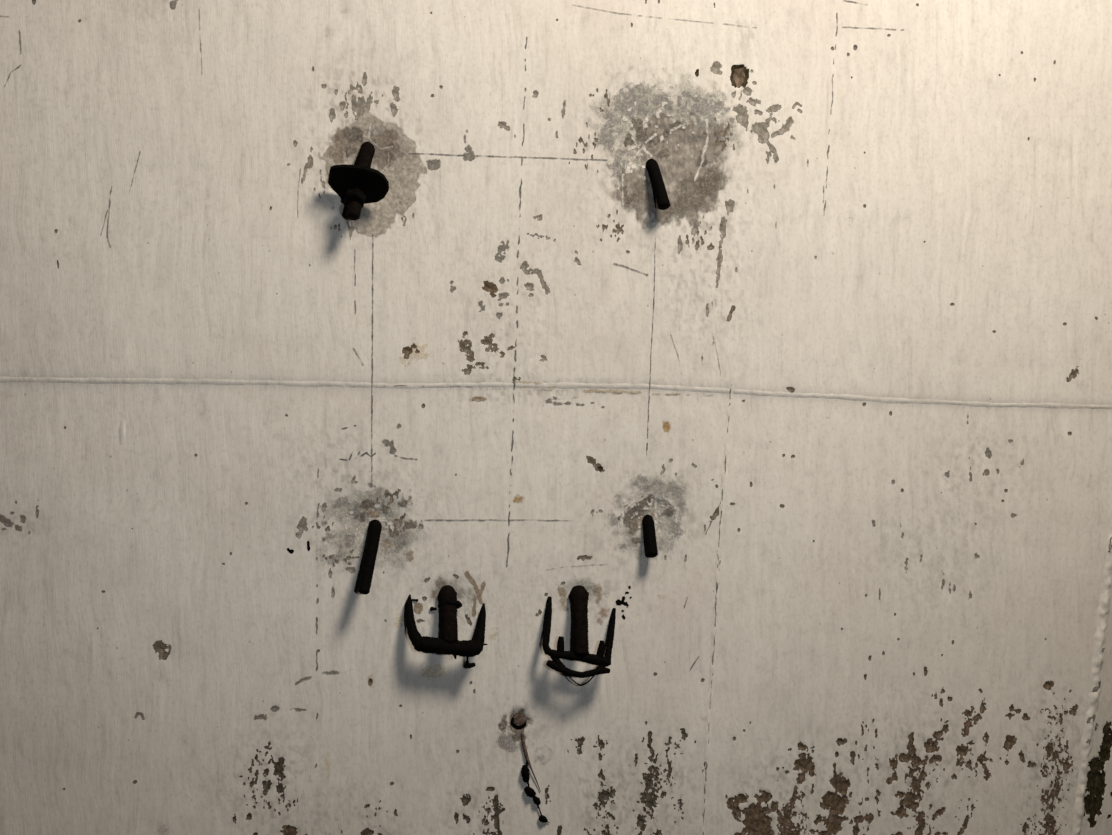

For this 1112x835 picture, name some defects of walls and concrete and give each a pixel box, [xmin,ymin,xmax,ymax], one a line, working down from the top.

spalling [498,709,533,751]
peeling [233,741,307,835]
peeling [361,800,398,835]
peeling [454,787,505,835]
peeling [567,735,619,835]
peeling [633,721,696,835]